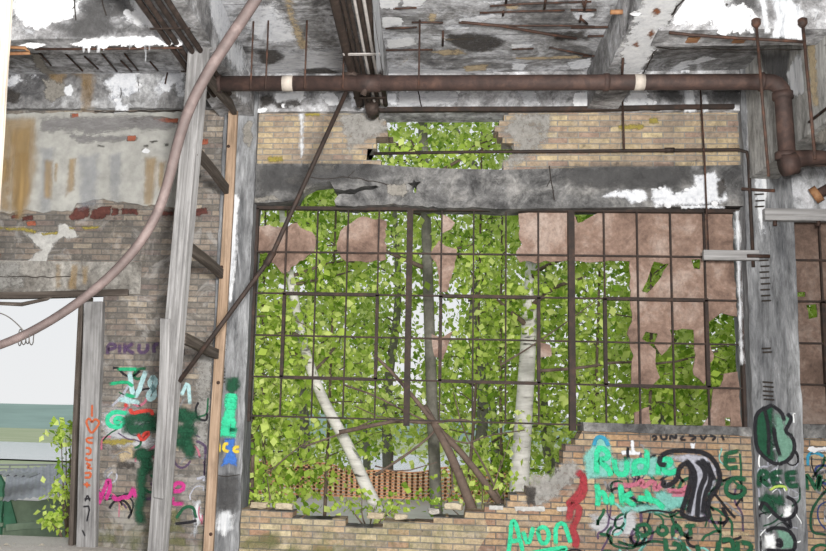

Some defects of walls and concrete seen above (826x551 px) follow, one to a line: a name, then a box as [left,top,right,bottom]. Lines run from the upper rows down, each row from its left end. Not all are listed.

peeling [12,0,183,102]
spalling [379,0,608,57]
peeling [619,0,803,74]
spalling [11,215,36,226]
spalling [69,206,138,220]
spalling [717,179,727,198]